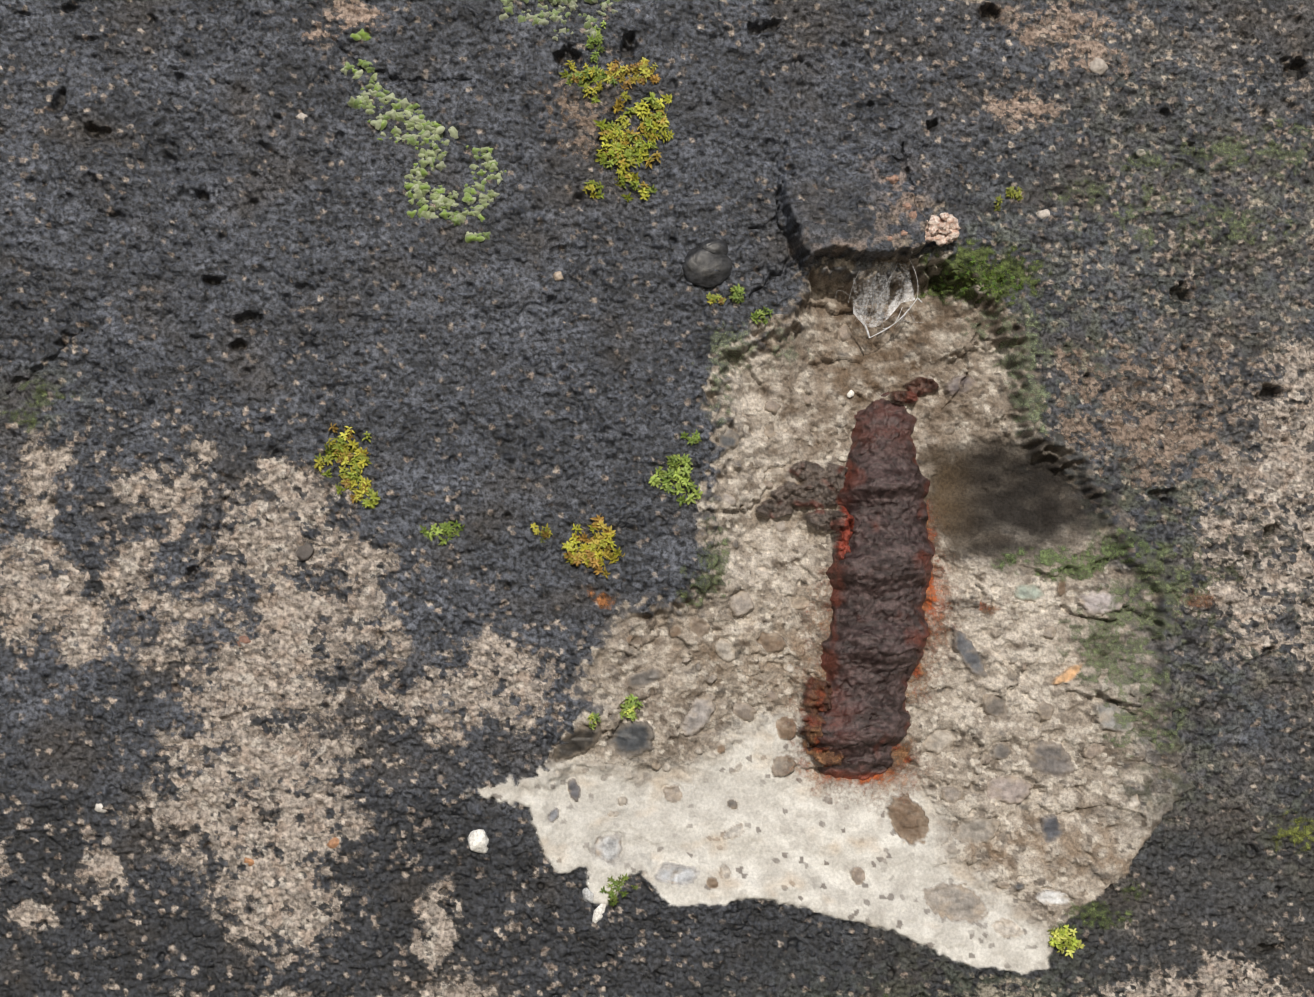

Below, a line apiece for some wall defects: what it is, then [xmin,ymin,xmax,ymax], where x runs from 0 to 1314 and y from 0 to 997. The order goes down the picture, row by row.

crack [748,181,804,299]
spalling [1163,279,1205,311]
spalling [478,126,1193,975]
rust [908,564,999,699]
rust [800,671,912,786]